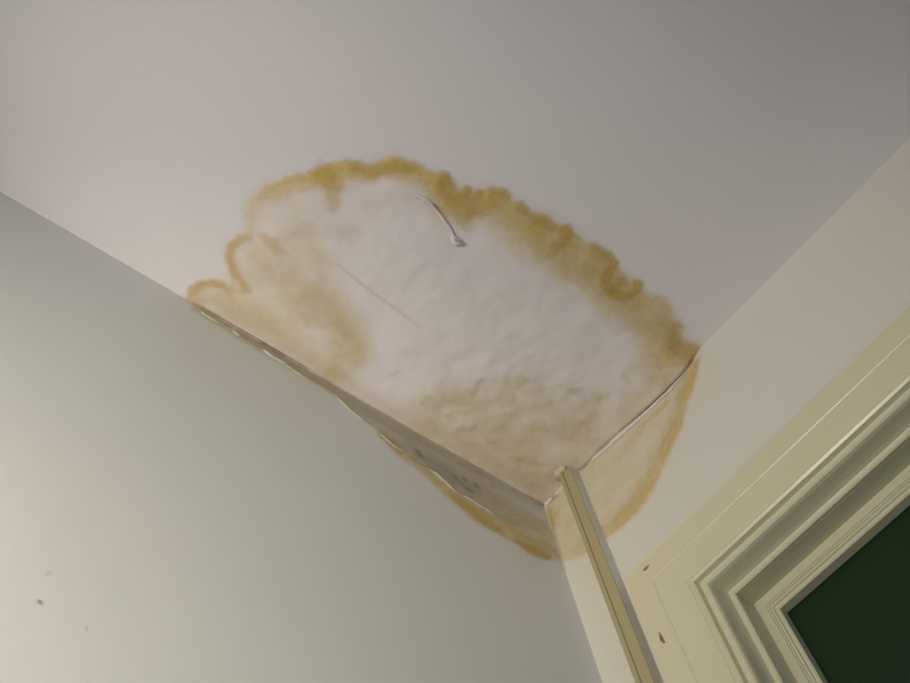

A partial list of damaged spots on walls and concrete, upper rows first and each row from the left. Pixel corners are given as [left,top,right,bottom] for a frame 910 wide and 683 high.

leakage [266,158,576,250]
leakage [444,485,549,557]